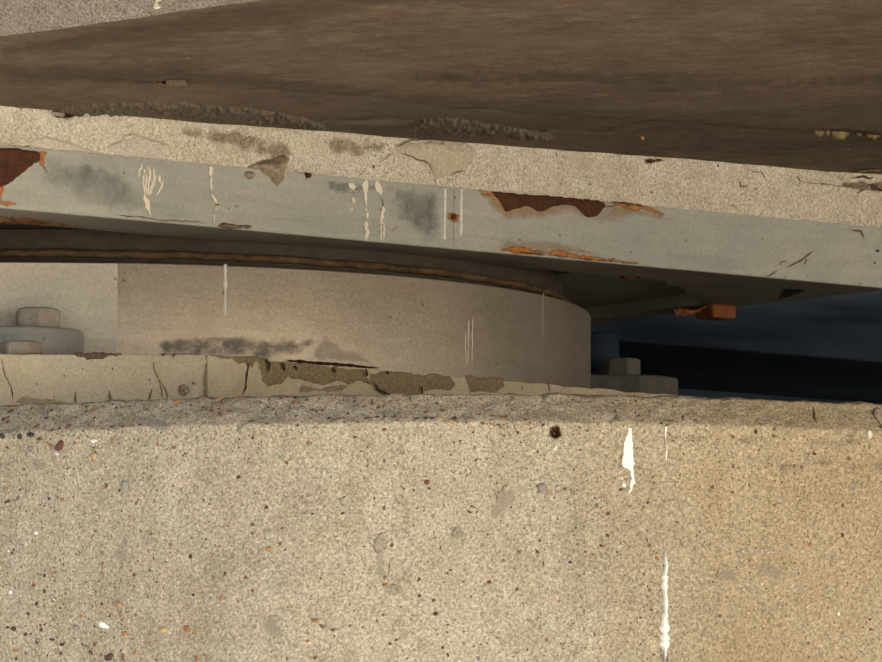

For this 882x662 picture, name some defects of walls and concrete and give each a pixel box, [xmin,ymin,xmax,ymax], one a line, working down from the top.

rust [0,146,47,206]
water stain [138,163,164,196]
rust [481,192,660,217]
rust [0,218,66,227]
water stain [364,206,386,241]
rust [502,247,637,264]
spalling [0,352,679,441]
efflorescence [618,428,635,494]
efflorescence [659,551,670,660]